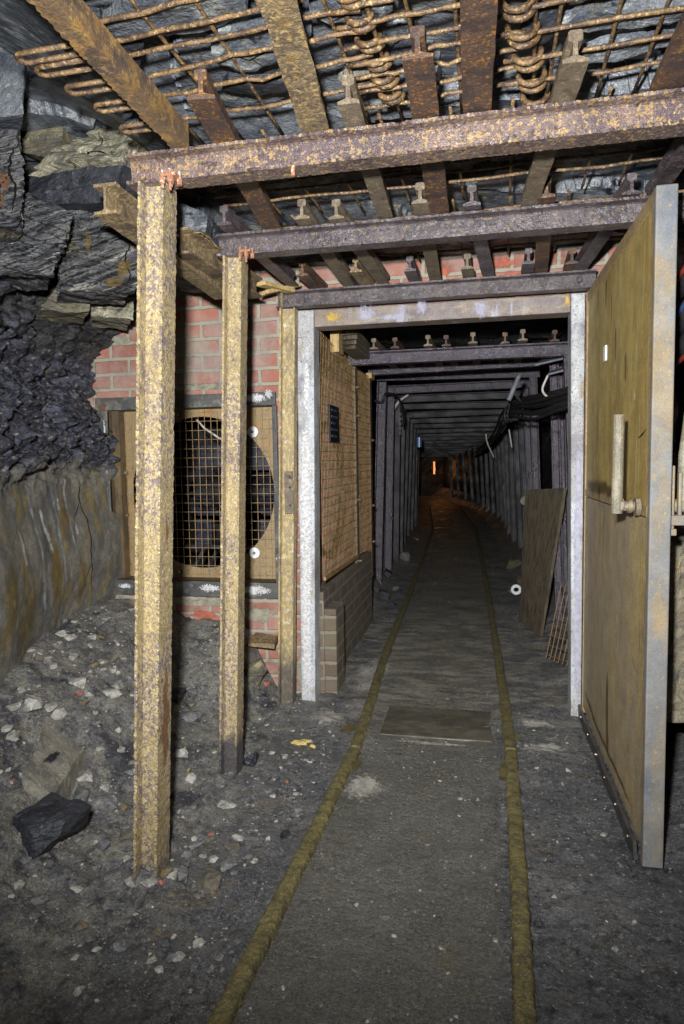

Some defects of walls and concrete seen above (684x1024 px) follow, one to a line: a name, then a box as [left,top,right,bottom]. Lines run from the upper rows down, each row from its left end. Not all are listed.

rust [161,670,169,766]